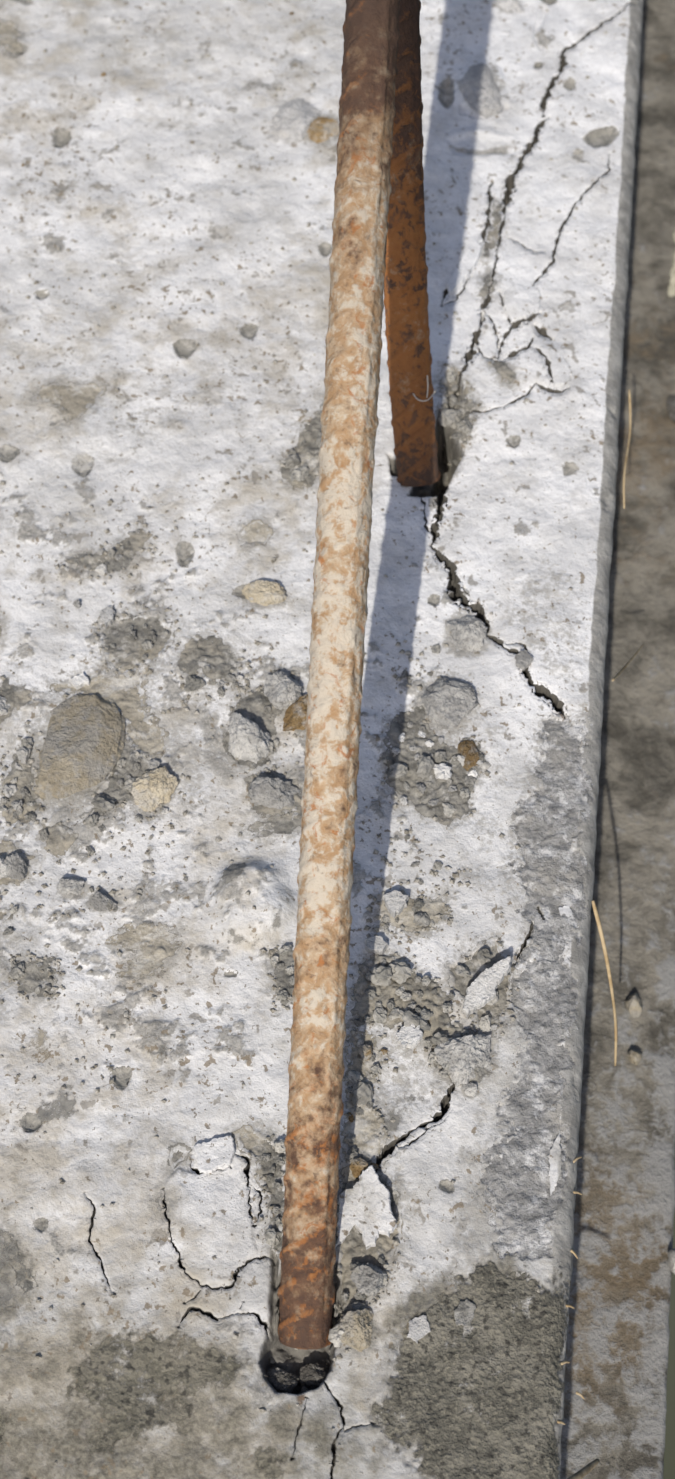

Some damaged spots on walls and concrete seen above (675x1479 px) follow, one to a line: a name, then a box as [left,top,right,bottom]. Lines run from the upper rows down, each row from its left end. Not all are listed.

crack [439,1,635,415]
crack [418,488,568,719]
spalling [167,0,599,1356]
crack [512,907,544,965]
crack [375,1082,458,1172]
damp [66,1330,242,1468]
damp [255,1447,288,1479]
crack [289,1379,373,1479]
damp [371,1262,571,1479]